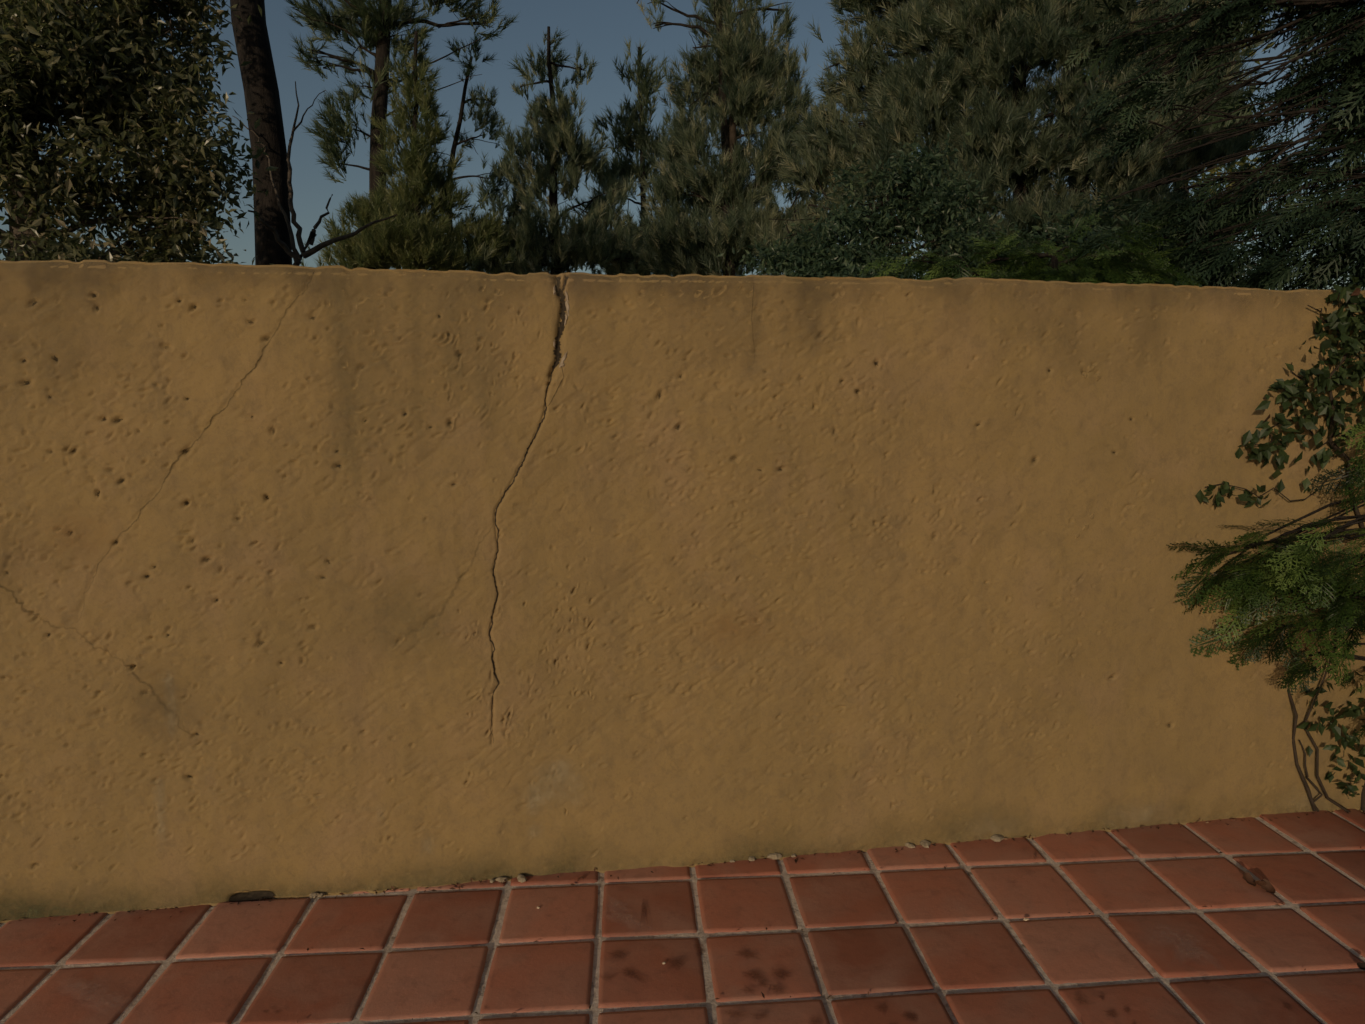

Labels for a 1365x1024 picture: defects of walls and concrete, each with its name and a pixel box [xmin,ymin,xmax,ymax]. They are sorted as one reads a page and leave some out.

crack [489,276,569,743]